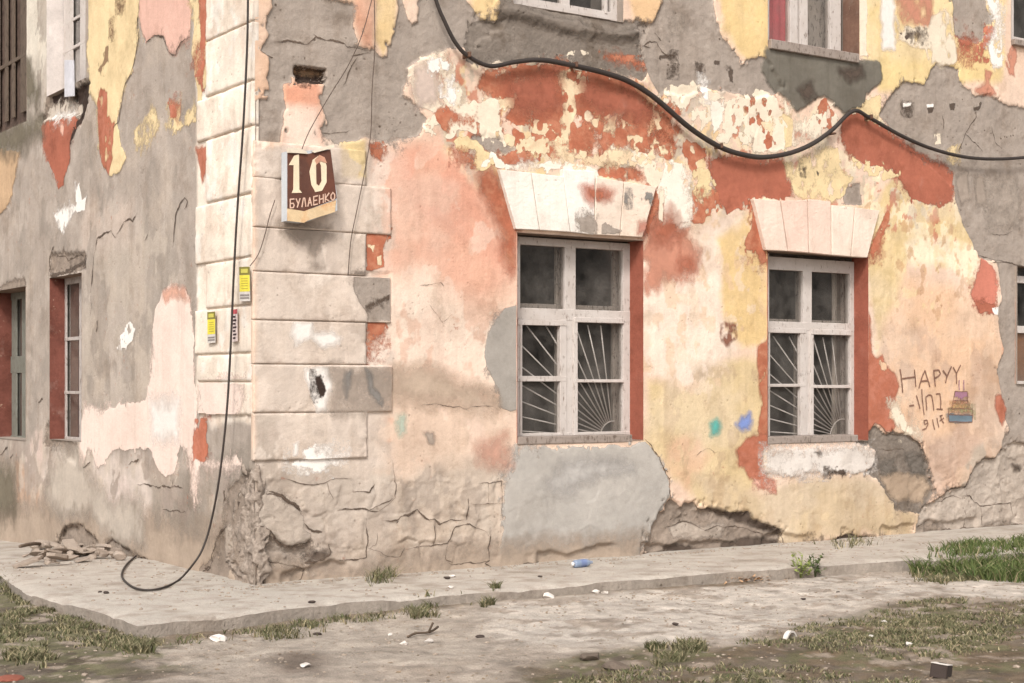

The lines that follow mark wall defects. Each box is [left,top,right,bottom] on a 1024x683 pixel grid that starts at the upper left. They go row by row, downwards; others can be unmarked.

peeling [41,0,207,234]
flaking render [255,0,1024,533]
peeling [45,278,328,585]
crack [260,460,503,580]
flaking render [642,500,781,553]